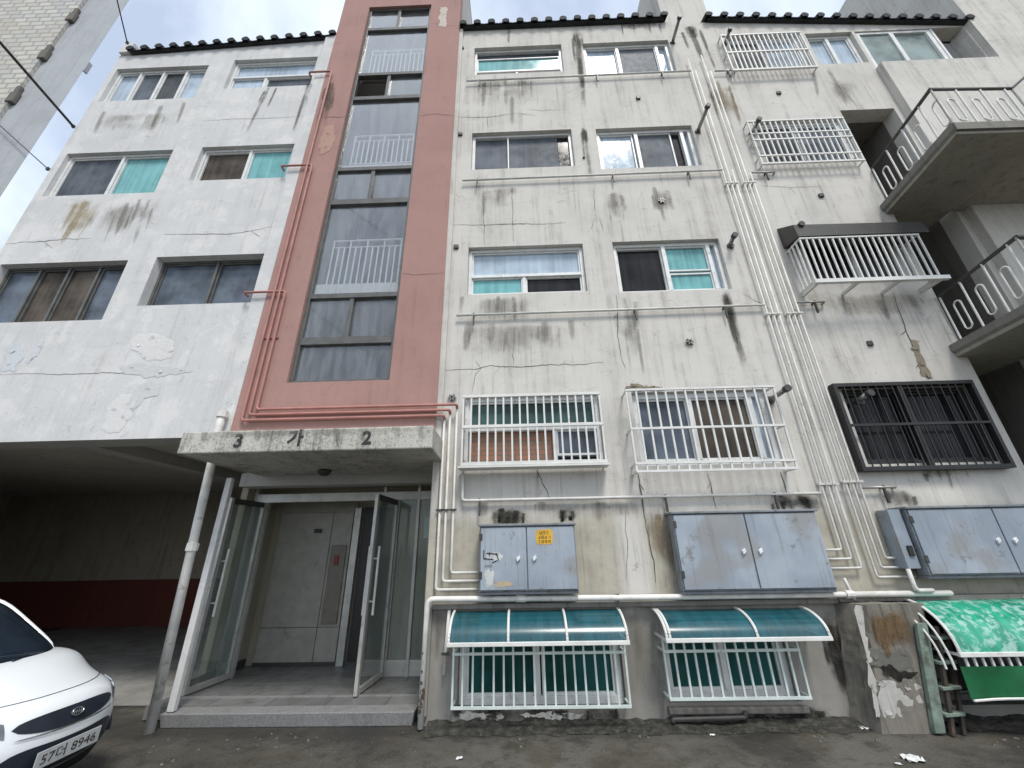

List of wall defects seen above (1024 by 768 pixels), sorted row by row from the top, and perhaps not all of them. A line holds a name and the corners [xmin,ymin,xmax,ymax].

water stain [572,38,584,85]
crack [455,295,625,391]
water stain [724,296,742,350]
crack [893,293,929,378]
peeling [119,361,193,422]
crack [625,475,656,583]
peeling [854,605,924,718]
rust [873,614,910,656]